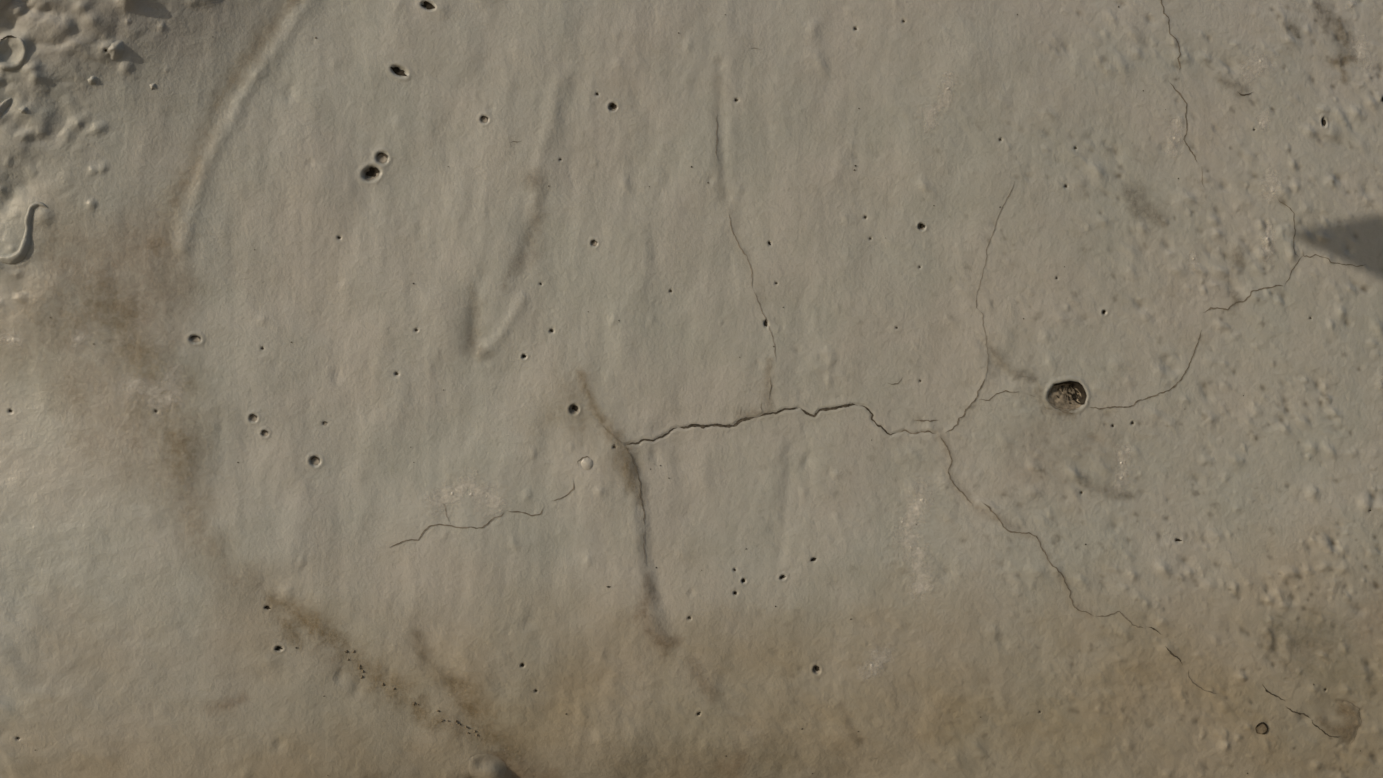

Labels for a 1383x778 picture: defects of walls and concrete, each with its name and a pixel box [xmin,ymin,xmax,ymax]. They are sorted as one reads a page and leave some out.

crack [1161,0,1204,187]
crack [1090,201,1367,410]
crack [391,185,1217,694]